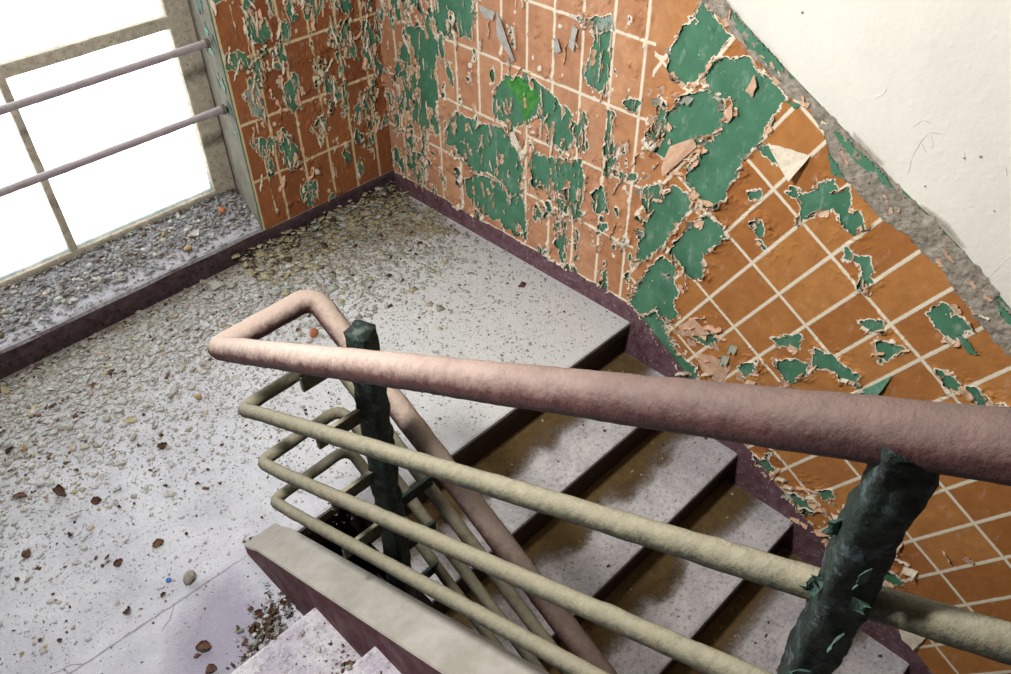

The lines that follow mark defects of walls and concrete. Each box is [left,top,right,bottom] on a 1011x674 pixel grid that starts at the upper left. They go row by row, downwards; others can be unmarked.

spalling [196,0,1011,385]
peeling [770,334,892,395]
peeling [753,453,845,547]
peeling [799,572,824,598]
peeling [848,568,872,615]
peeling [899,629,925,650]